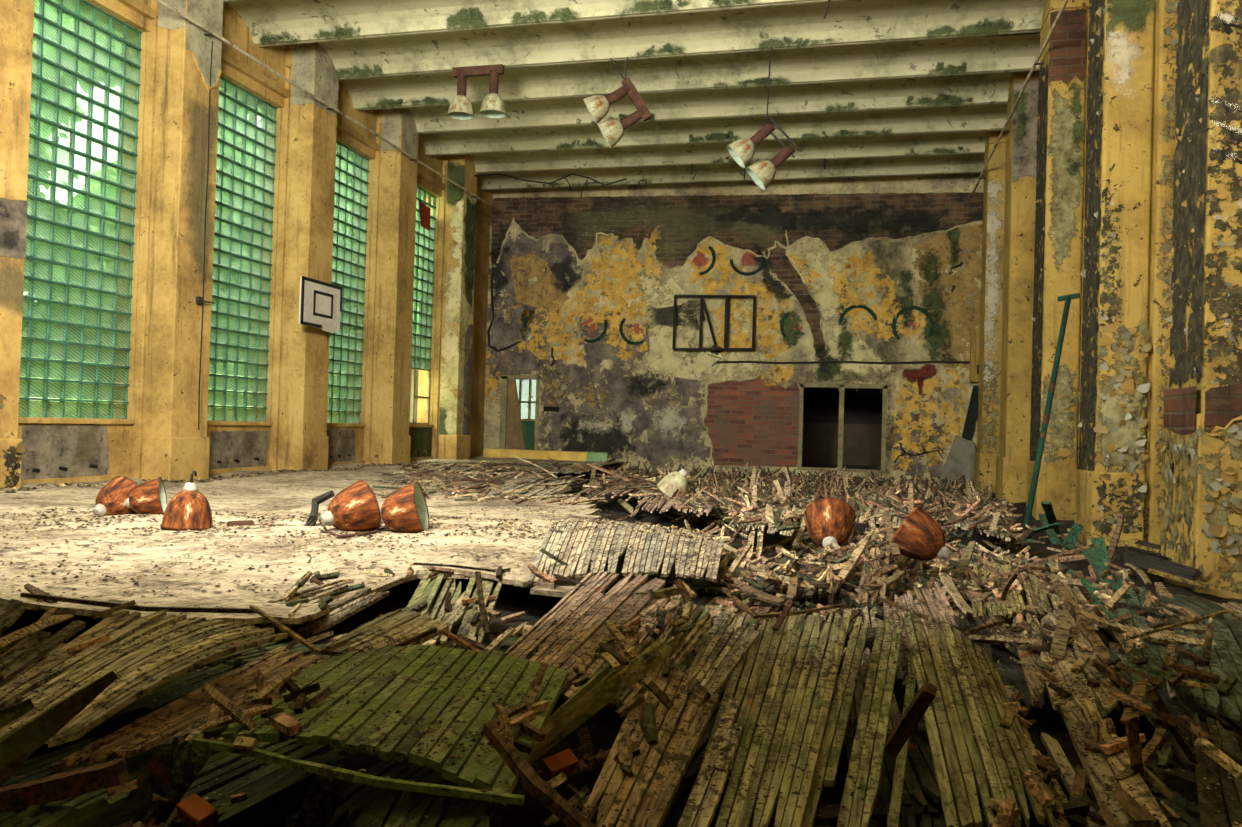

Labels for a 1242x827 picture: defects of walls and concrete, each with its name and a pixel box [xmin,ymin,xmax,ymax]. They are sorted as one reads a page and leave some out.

flaking render [158,0,223,91]
flaking render [291,42,339,114]
flaking render [381,108,418,159]
flaking render [409,0,1242,599]
damp [486,232,713,469]